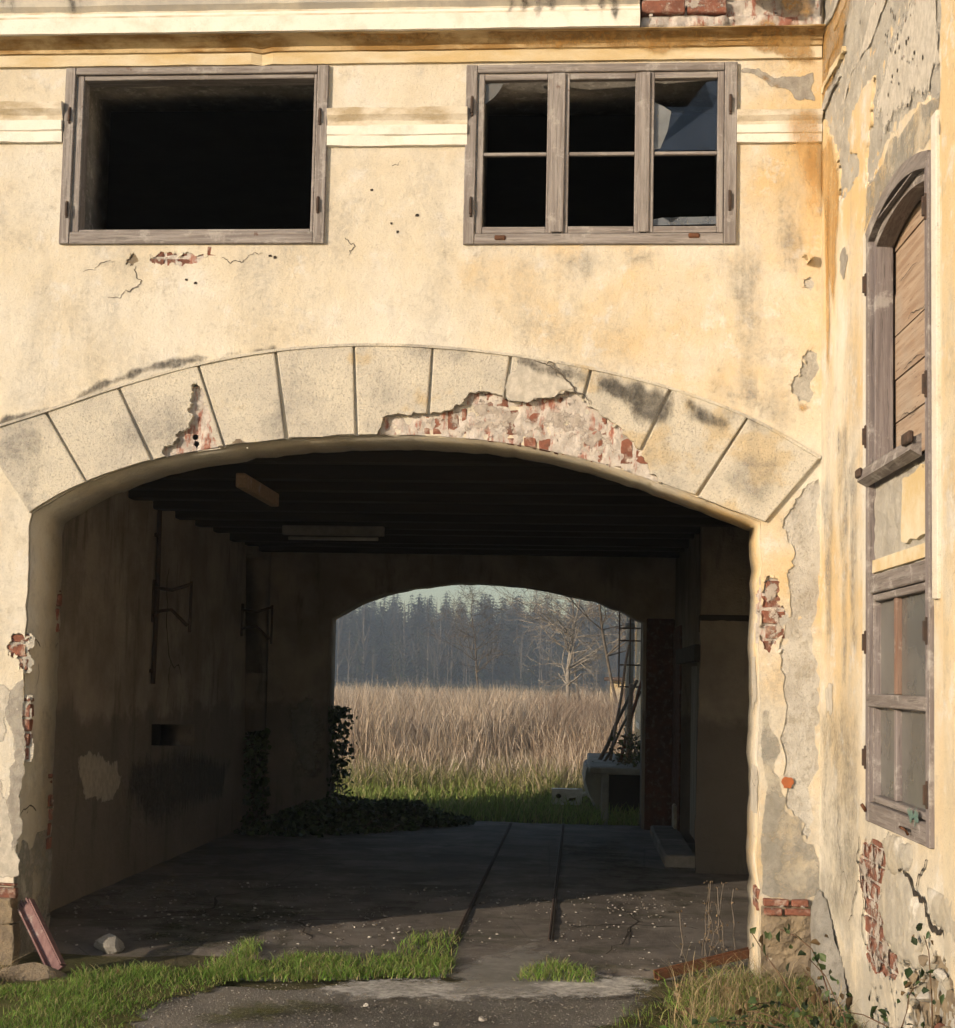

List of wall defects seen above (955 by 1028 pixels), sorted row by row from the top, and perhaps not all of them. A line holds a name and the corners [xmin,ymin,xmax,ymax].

flaking render [741,0,941,201]
spalling [126,247,212,267]
spalling [788,346,819,403]
spalling [163,386,218,457]
spalling [378,392,662,484]
spalling [752,480,833,838]
flaking render [0,632,35,965]
peeling [78,750,122,803]
flaking render [750,764,758,814]
crack [837,806,870,962]
spalling [859,837,955,1028]
crack [898,860,944,936]